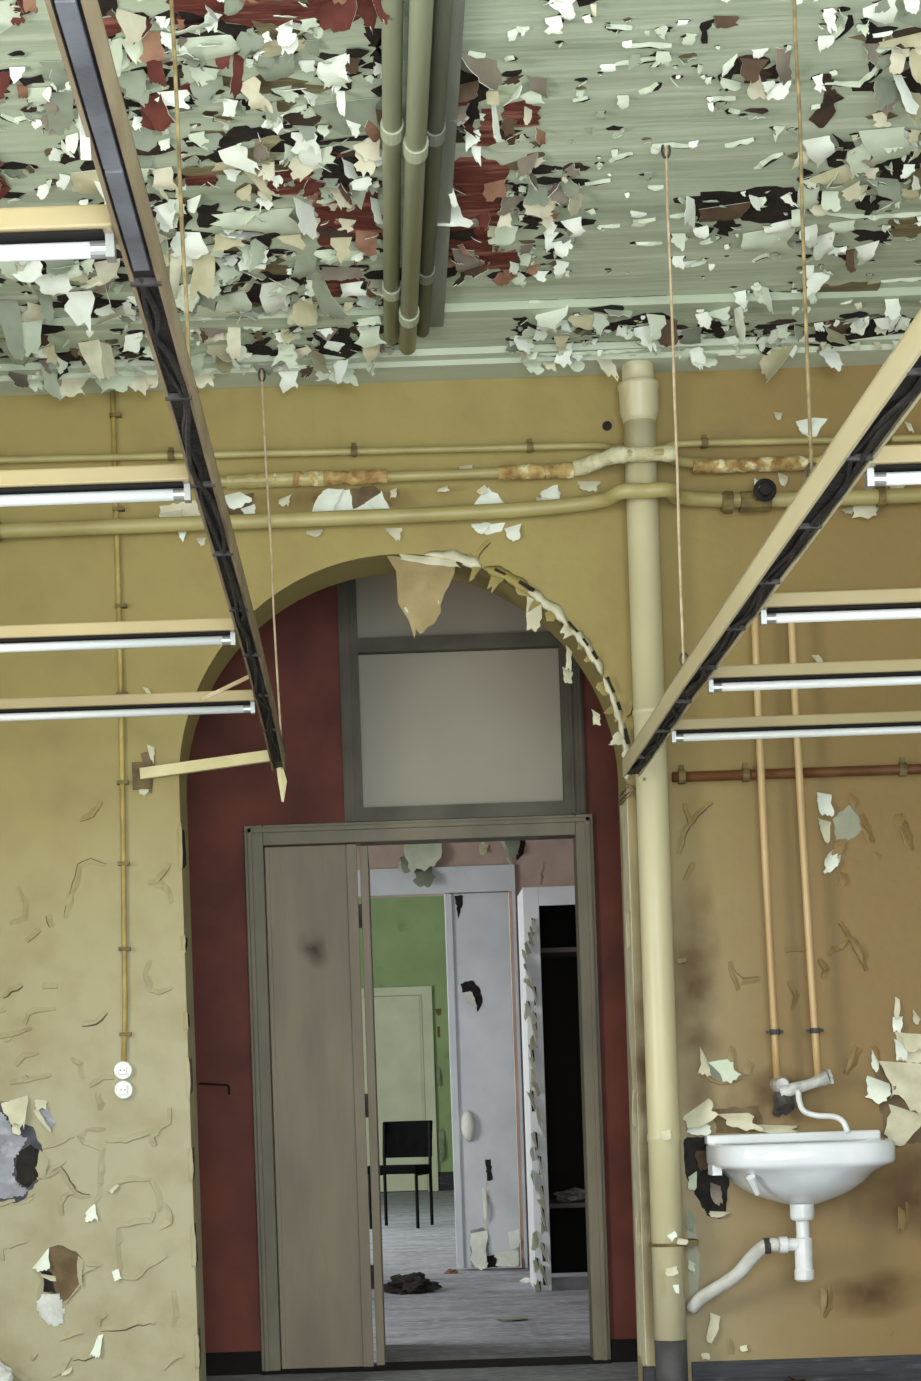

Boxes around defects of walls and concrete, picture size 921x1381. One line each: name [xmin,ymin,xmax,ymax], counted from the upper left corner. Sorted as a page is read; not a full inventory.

peeling [0,50,106,205]
peeling [98,0,402,394]
peeling [437,0,921,383]
peeling [0,249,159,401]
peeling [312,486,397,511]
peeling [386,528,631,758]
flaking render [0,1095,66,1207]
flaking render [32,1245,97,1327]
peeling [470,918,549,1292]
peeling [619,774,647,1366]
peeling [661,1046,798,1300]
peeling [844,997,921,1146]